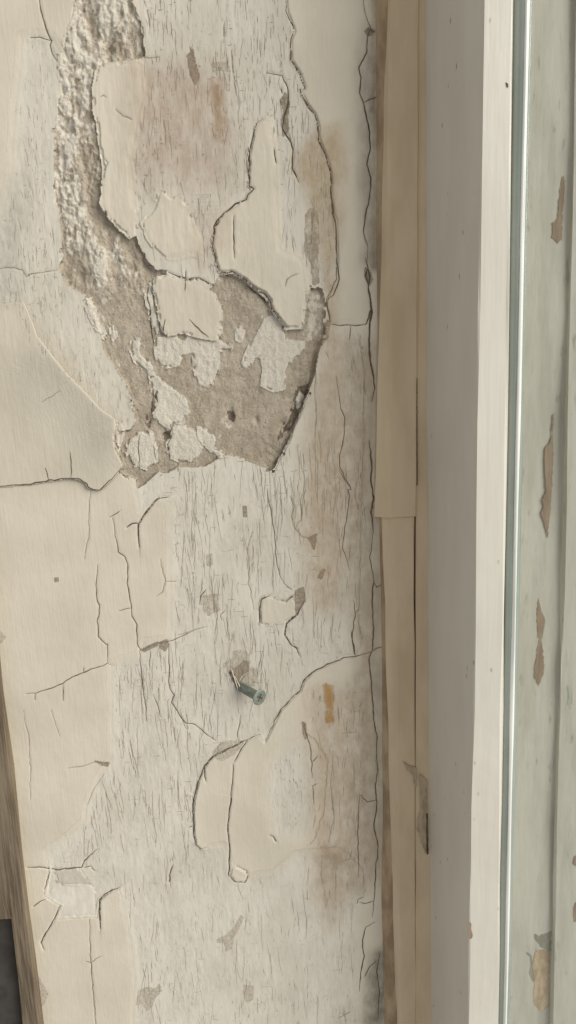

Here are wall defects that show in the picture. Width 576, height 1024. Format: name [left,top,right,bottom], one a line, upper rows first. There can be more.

crack [147,0,376,400]
peeling [551,176,565,244]
peeling [0,0,377,1024]
peeling [541,414,554,537]
crack [0,352,381,1021]
peeling [534,599,545,686]
peeling [526,931,552,1012]